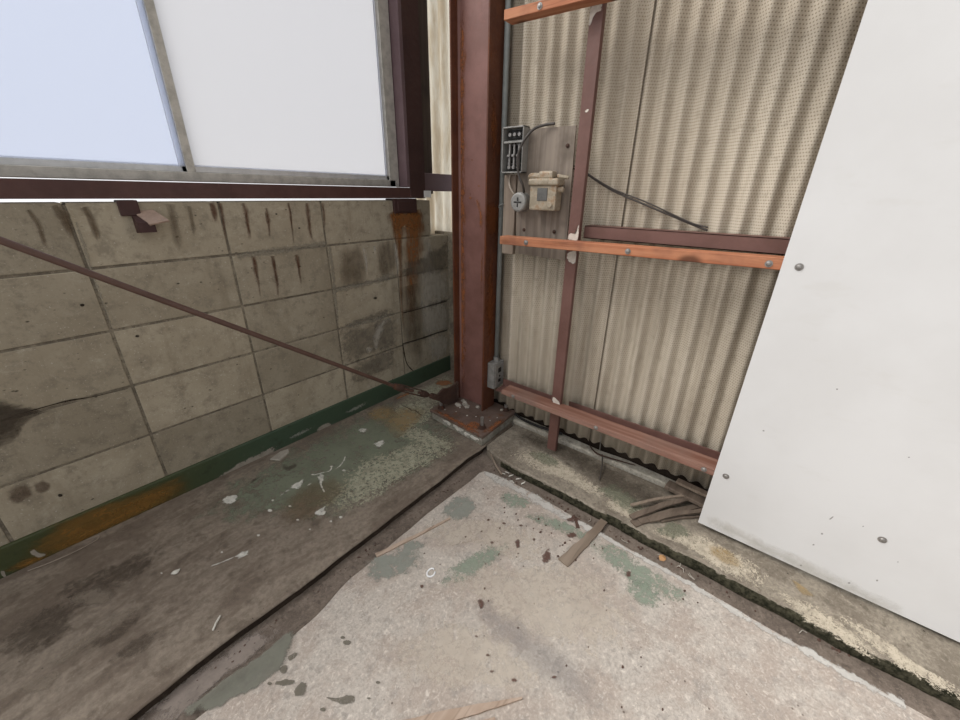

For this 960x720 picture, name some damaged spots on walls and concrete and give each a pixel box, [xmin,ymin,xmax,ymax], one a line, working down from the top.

corrosion [391,212,424,308]
corrosion [487,205,498,234]
leakage [0,403,40,445]
corrosion [17,486,177,567]